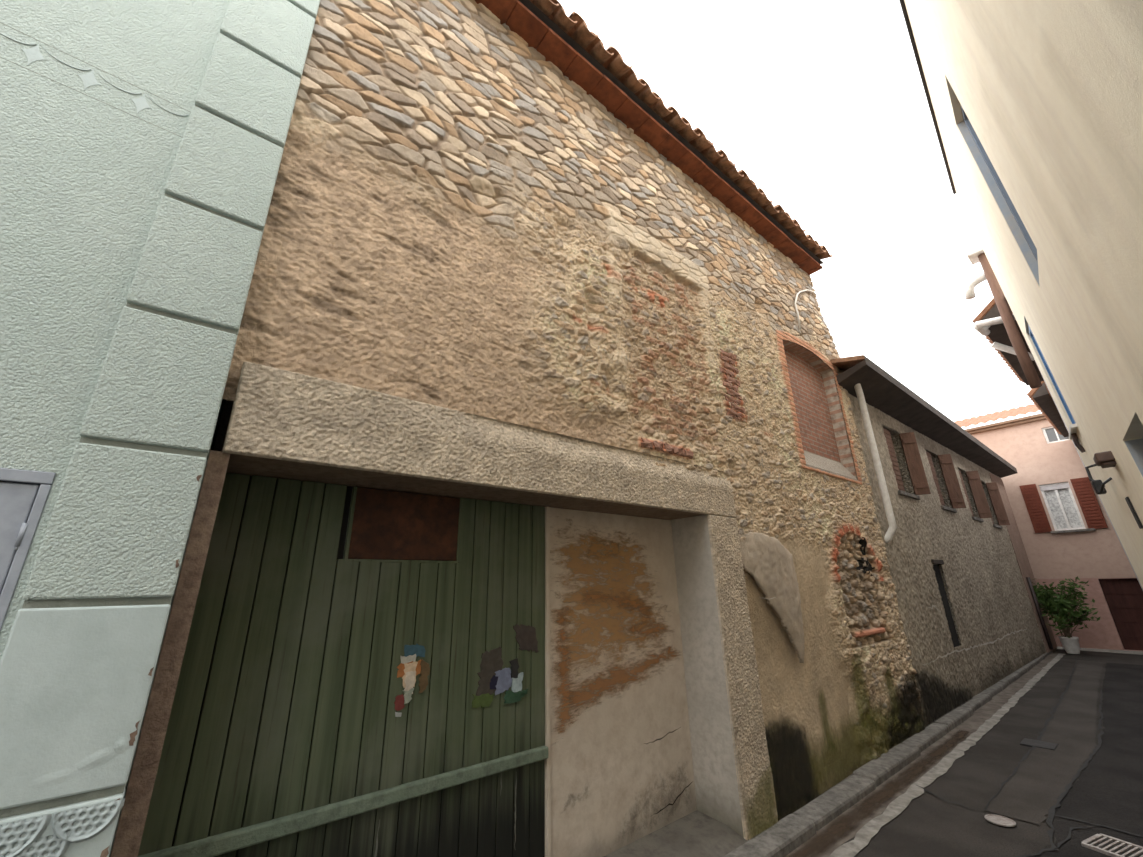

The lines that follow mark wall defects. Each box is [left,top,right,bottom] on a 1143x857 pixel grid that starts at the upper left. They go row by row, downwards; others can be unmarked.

crack [653,781,693,815]
leakage [765,721,818,820]
leakage [786,731,970,857]